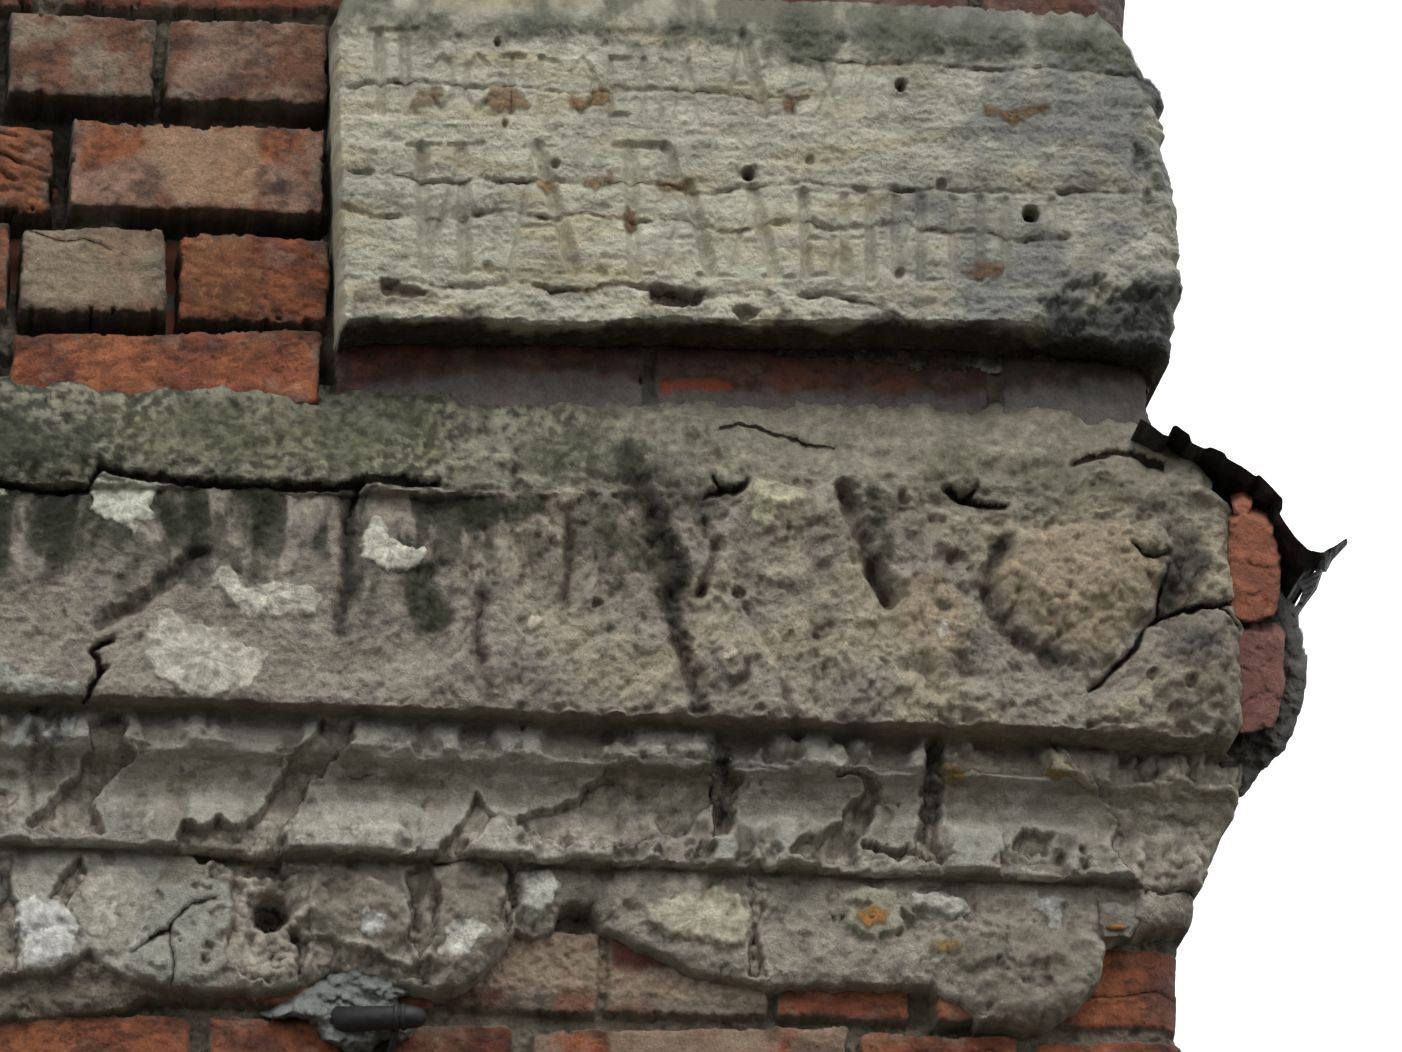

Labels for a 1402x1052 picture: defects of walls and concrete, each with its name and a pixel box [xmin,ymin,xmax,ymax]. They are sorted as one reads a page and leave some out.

crack [82,639,112,705]
water stain [335,490,356,636]
crack [702,474,748,500]
crack [718,421,835,449]
flaking render [751,478,804,526]
crack [1073,450,1164,470]
crack [1088,543,1238,692]
flaking render [1227,492,1286,734]
spalling [0,652,134,846]
spalling [178,722,1023,988]
spalling [1039,733,1242,896]
crack [131,898,215,983]